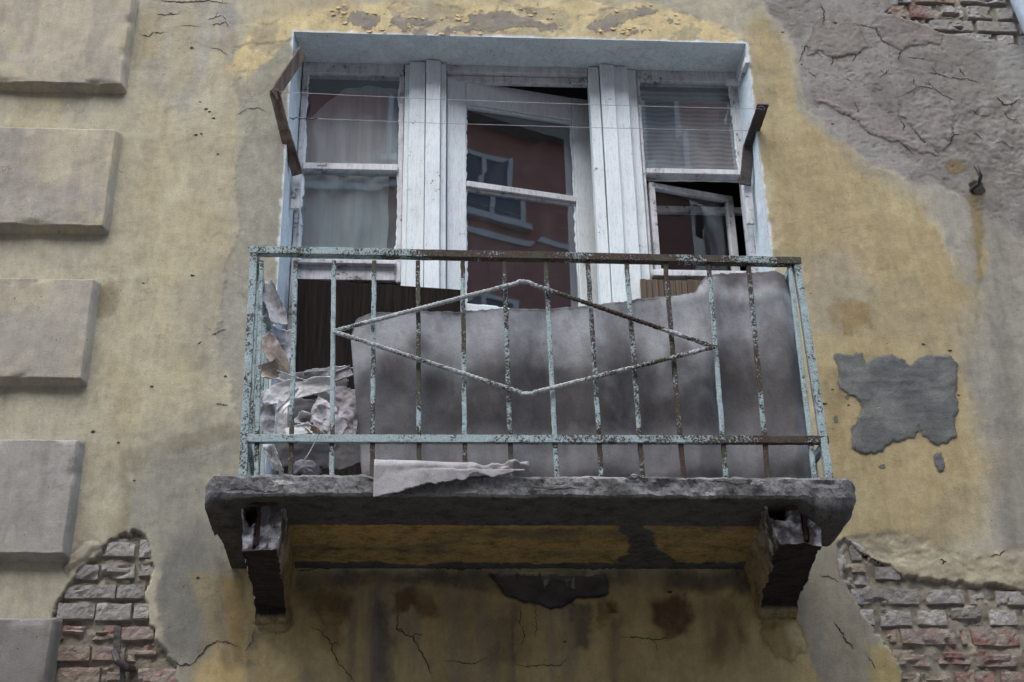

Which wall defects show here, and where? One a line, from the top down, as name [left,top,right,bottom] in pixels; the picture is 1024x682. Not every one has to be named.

peeling [330,4,561,36]
peeling [587,4,680,35]
spalling [884,0,1024,46]
crack [799,4,1019,154]
peeling [815,87,955,156]
spalling [969,180,985,195]
spalling [56,539,177,682]
crack [309,626,354,681]
crack [396,608,486,673]
spalling [490,574,609,609]
spalling [846,545,1024,682]